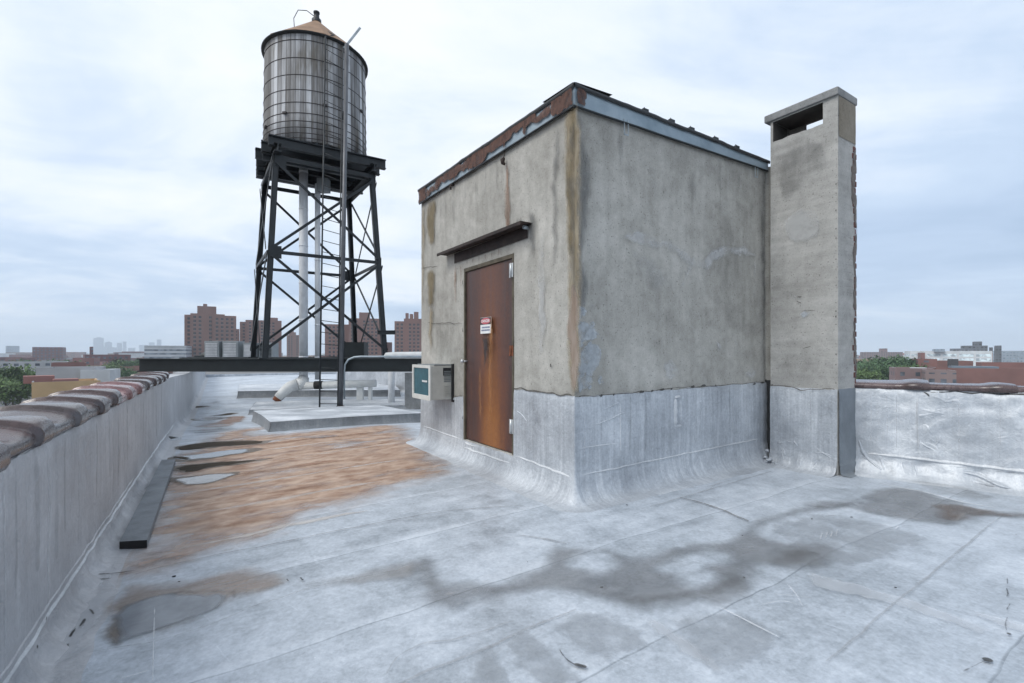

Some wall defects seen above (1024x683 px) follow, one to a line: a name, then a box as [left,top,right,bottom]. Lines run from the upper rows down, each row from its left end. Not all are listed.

corrosion [418,88,587,390]
water stain [939,505,988,519]